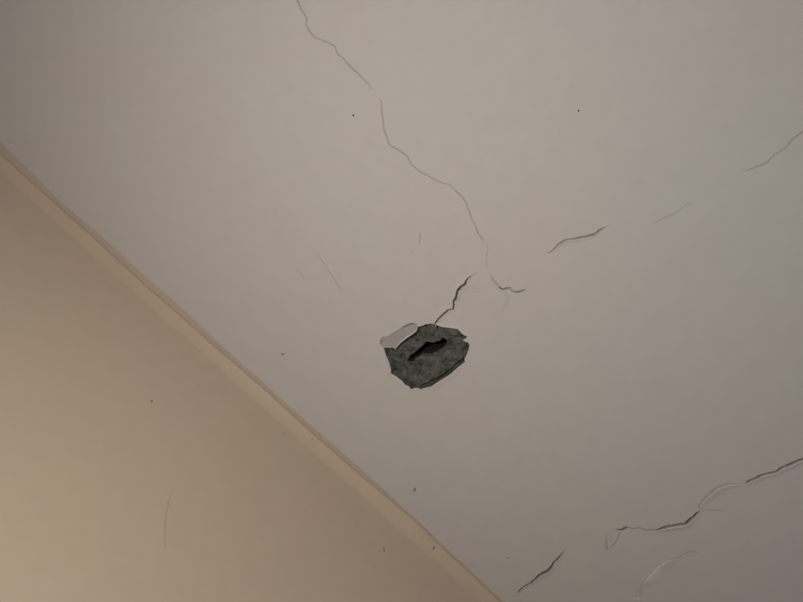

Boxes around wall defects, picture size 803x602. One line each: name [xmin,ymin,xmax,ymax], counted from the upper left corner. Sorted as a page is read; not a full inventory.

crack [548,226,606,254]
crack [434,272,525,328]
spalling [381,323,470,396]
crack [656,458,803,533]
crack [518,553,563,593]